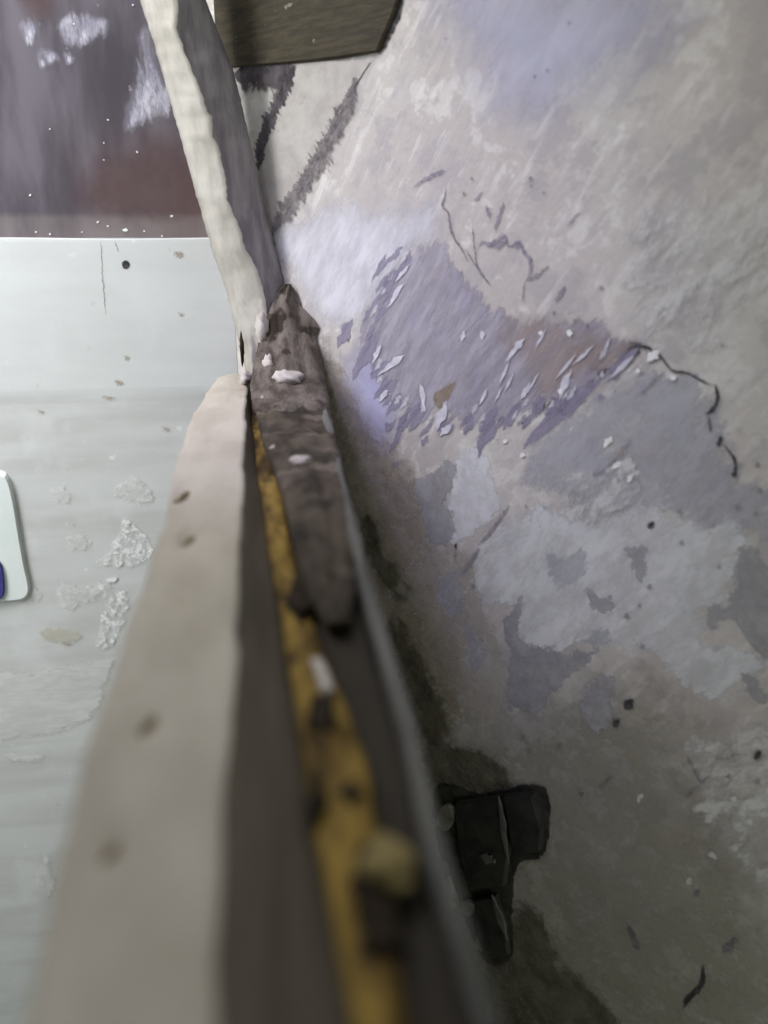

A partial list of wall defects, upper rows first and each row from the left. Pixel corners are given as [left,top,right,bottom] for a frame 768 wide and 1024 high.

crack [441,188,549,301]
peeling [337,240,659,467]
spalling [361,515,410,601]
peeling [412,458,457,546]
water stain [319,351,768,1024]
peeling [503,596,599,714]
peeling [583,588,641,619]
peeling [588,436,640,483]
peeling [626,544,652,590]
crack [623,345,737,477]
peeling [706,546,768,659]